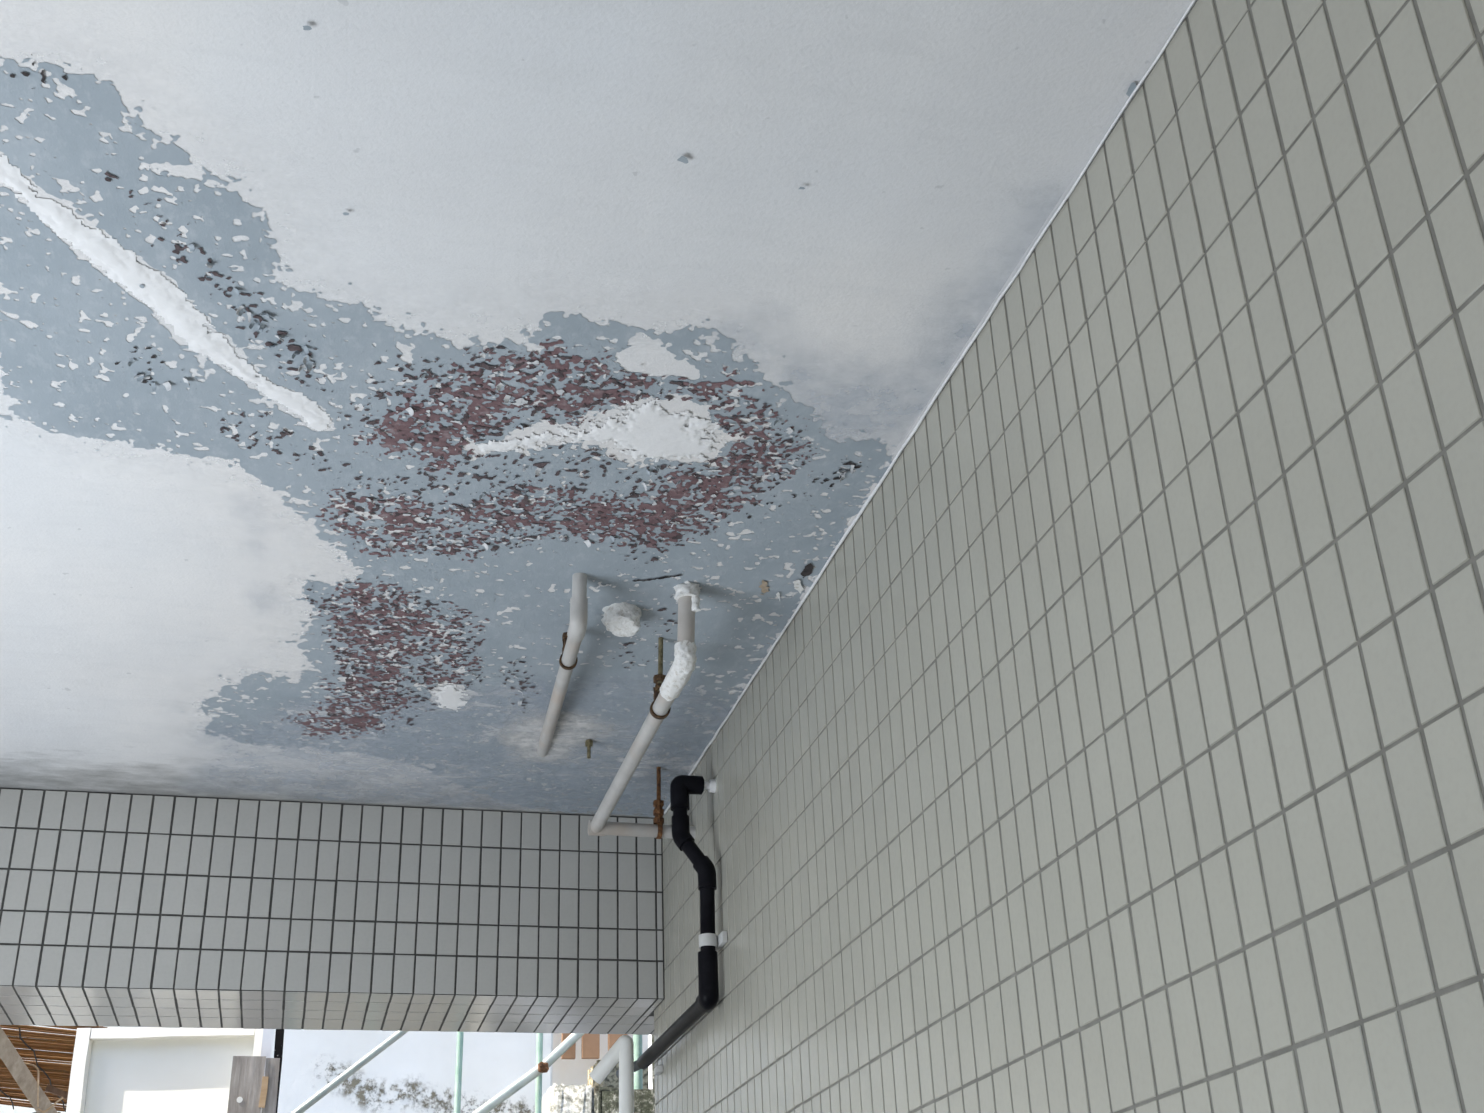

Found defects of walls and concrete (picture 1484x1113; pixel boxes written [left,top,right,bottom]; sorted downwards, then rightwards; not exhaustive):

peeling [0,54,895,817]